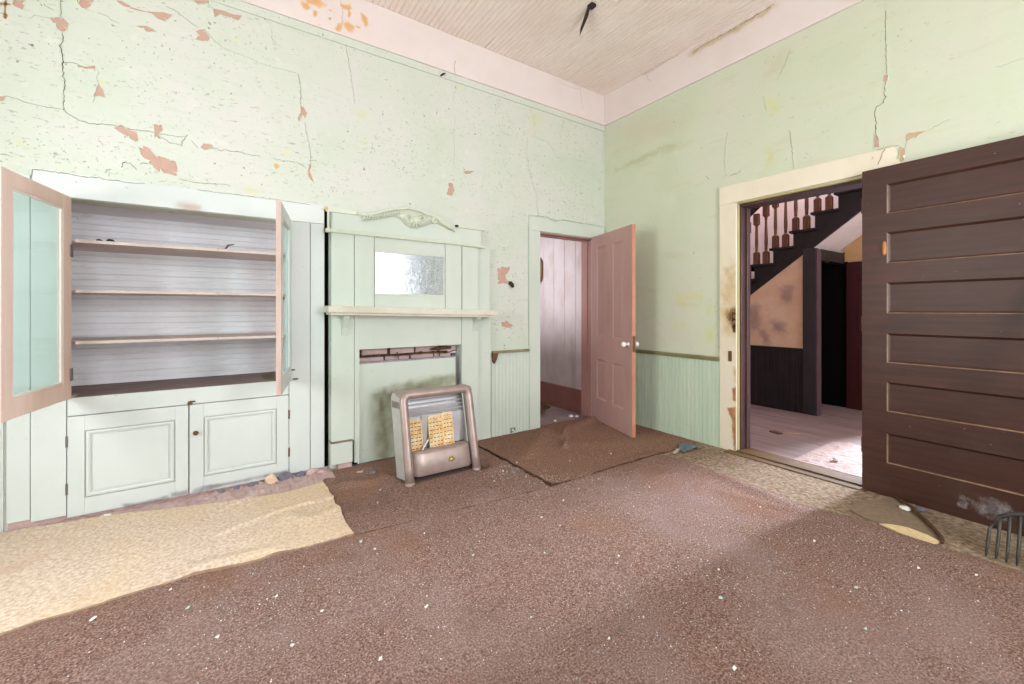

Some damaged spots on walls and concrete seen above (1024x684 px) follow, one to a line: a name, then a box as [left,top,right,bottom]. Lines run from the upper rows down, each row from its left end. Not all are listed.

peeling [193,0,243,21]
peeling [49,17,69,32]
peeling [93,83,106,98]
crack [4,0,311,166]
crack [874,10,906,164]
peeling [114,124,178,176]
peeling [899,131,925,162]
crack [31,161,150,184]
crack [182,179,309,205]
peeling [497,266,510,284]